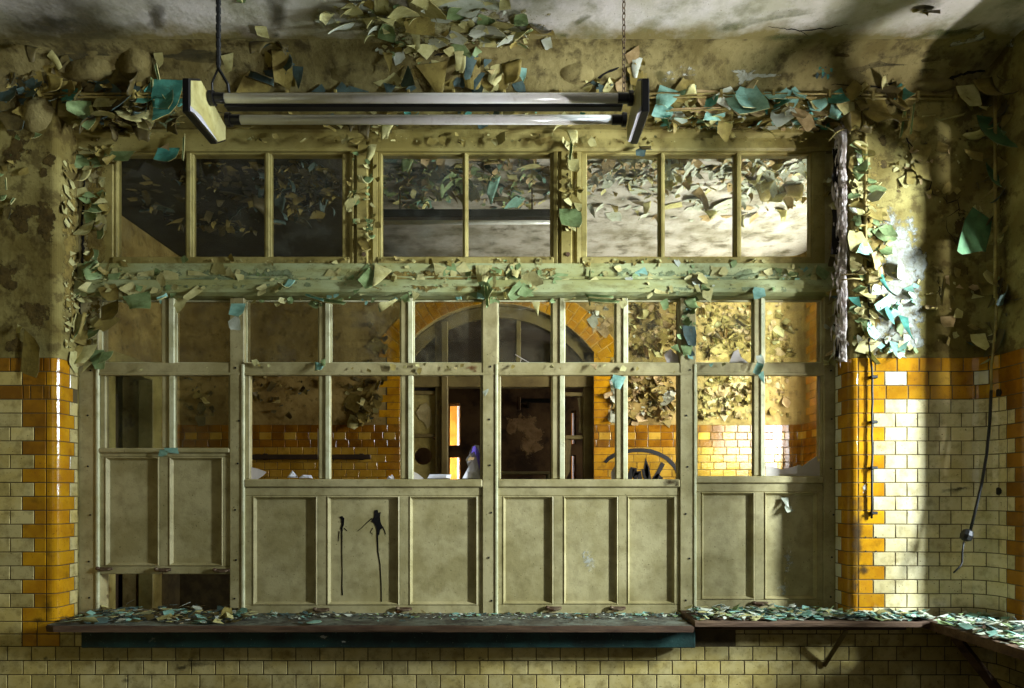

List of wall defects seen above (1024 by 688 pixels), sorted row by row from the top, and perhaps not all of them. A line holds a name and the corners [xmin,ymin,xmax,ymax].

peeling [312,0,555,93]
flaking render [0,45,1023,429]